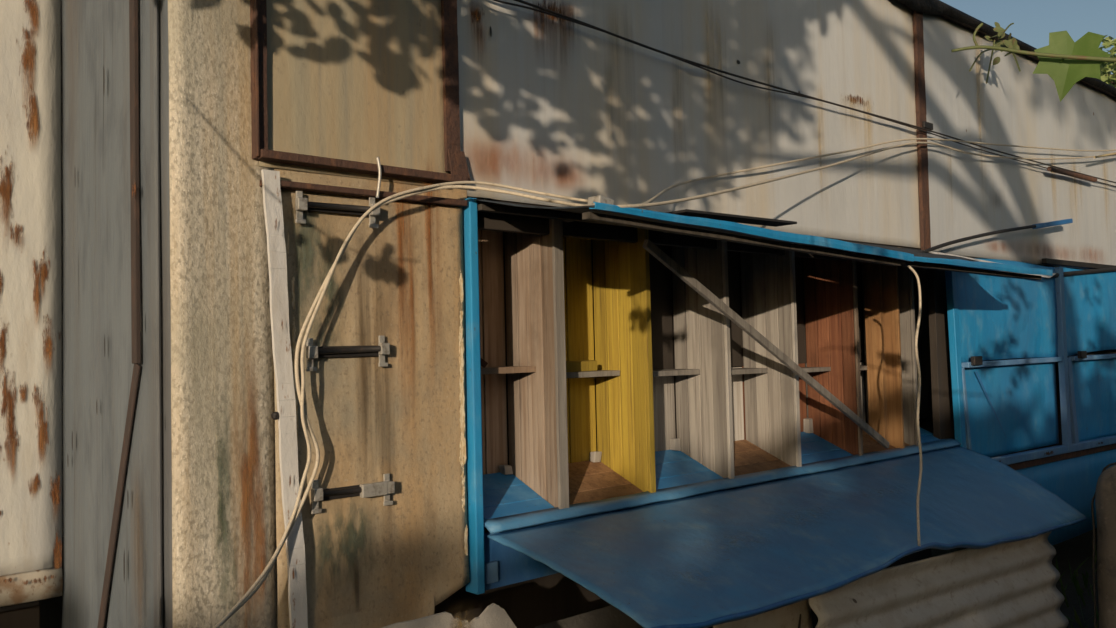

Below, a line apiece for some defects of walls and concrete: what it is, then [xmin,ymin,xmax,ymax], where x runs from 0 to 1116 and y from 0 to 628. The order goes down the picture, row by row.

corrosion [16,0,38,141]
corrosion [0,152,22,242]
corrosion [33,250,52,363]
corrosion [0,324,49,472]
corrosion [28,473,60,504]
corrosion [4,534,62,585]